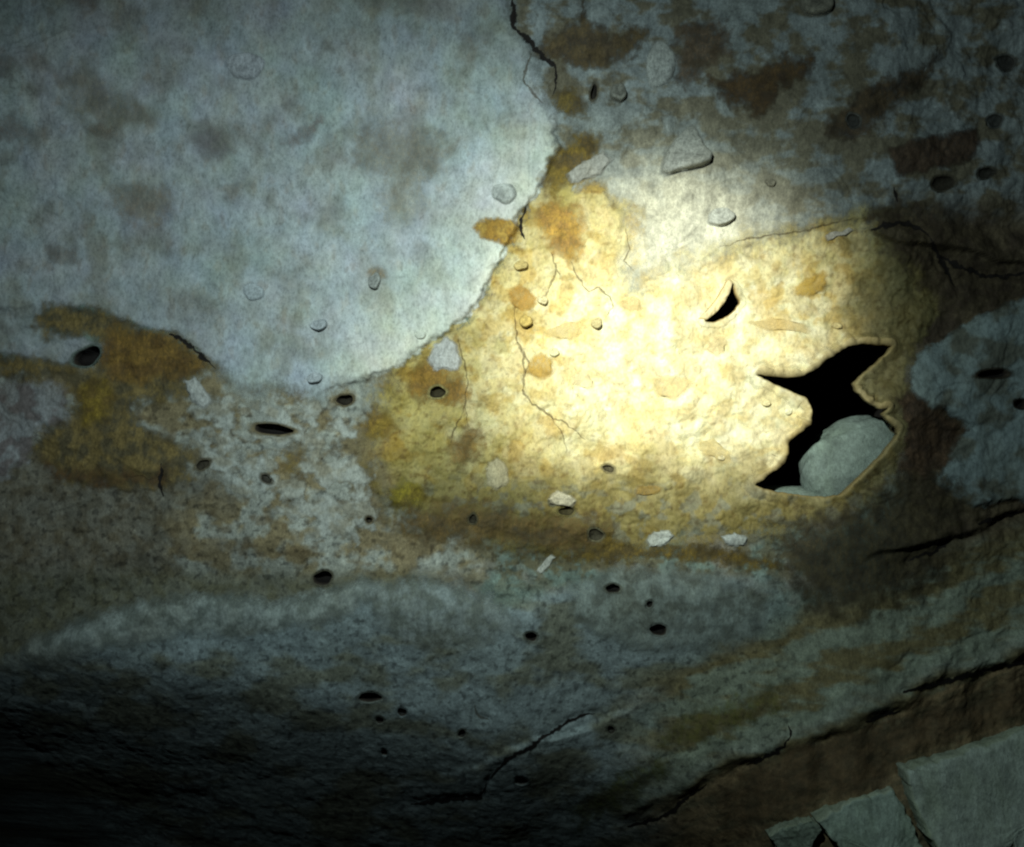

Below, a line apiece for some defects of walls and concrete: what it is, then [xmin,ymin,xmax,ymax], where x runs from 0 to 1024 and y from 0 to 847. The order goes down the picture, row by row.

crack [510,0,557,99]
spalling [185,152,939,573]
crack [411,713,595,805]